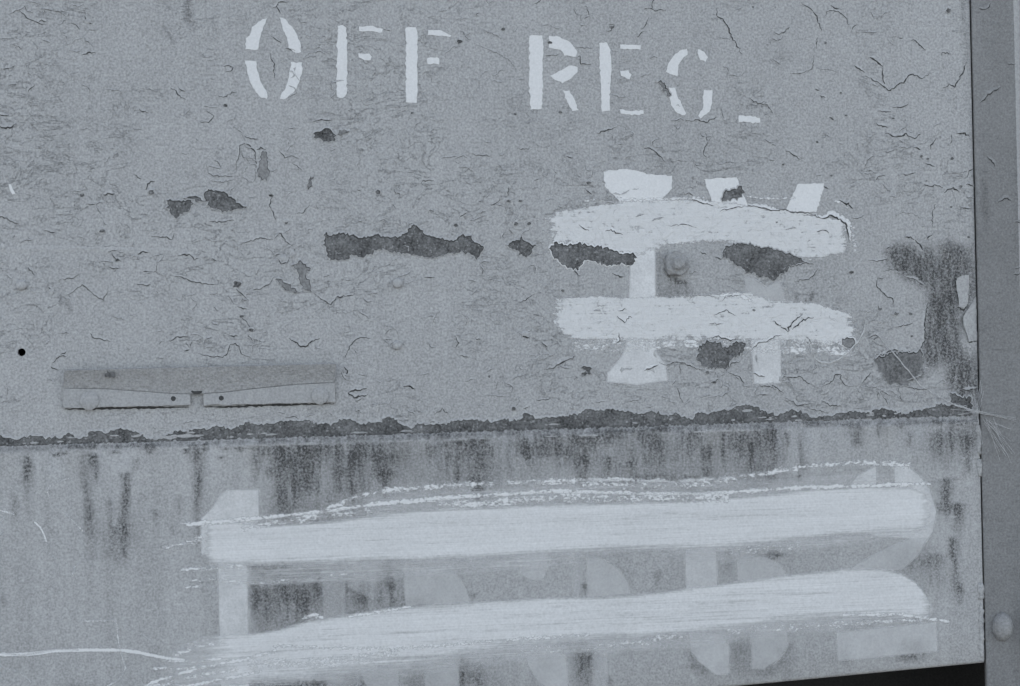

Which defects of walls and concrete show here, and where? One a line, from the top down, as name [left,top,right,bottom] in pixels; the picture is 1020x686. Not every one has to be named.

crack [1,0,97,92]
crack [268,0,325,97]
crack [0,53,344,383]
peeling [164,187,248,220]
peeling [322,222,485,262]
peeling [505,221,638,271]
crack [357,0,1000,413]
peeling [721,241,805,282]
crack [314,260,576,433]
peeling [695,339,747,384]
peeling [875,348,924,386]
peeling [948,391,974,410]